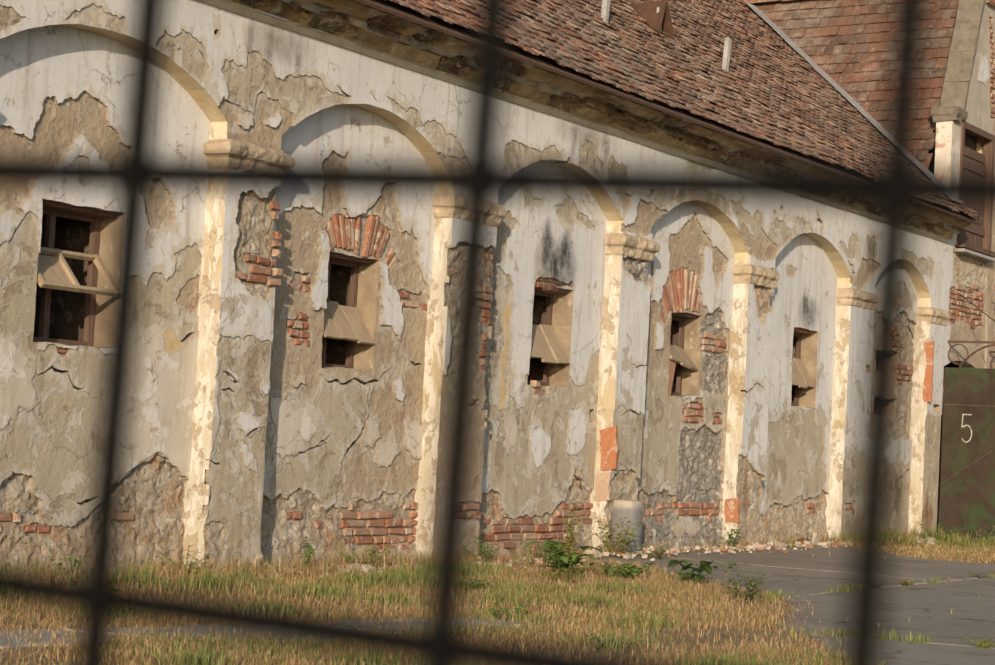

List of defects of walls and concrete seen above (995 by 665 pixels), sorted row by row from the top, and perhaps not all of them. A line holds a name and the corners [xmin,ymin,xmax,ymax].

peeling [66,3,125,34]
flaking render [0,91,121,157]
flaking render [444,246,457,319]
flaking render [949,249,995,351]
peeling [0,186,118,573]
peeling [118,243,202,573]
flaking render [203,192,428,570]
flaking render [433,375,446,530]
peeling [467,200,828,557]
peeling [841,452,858,537]
peeling [891,461,911,536]
peeling [898,298,941,534]